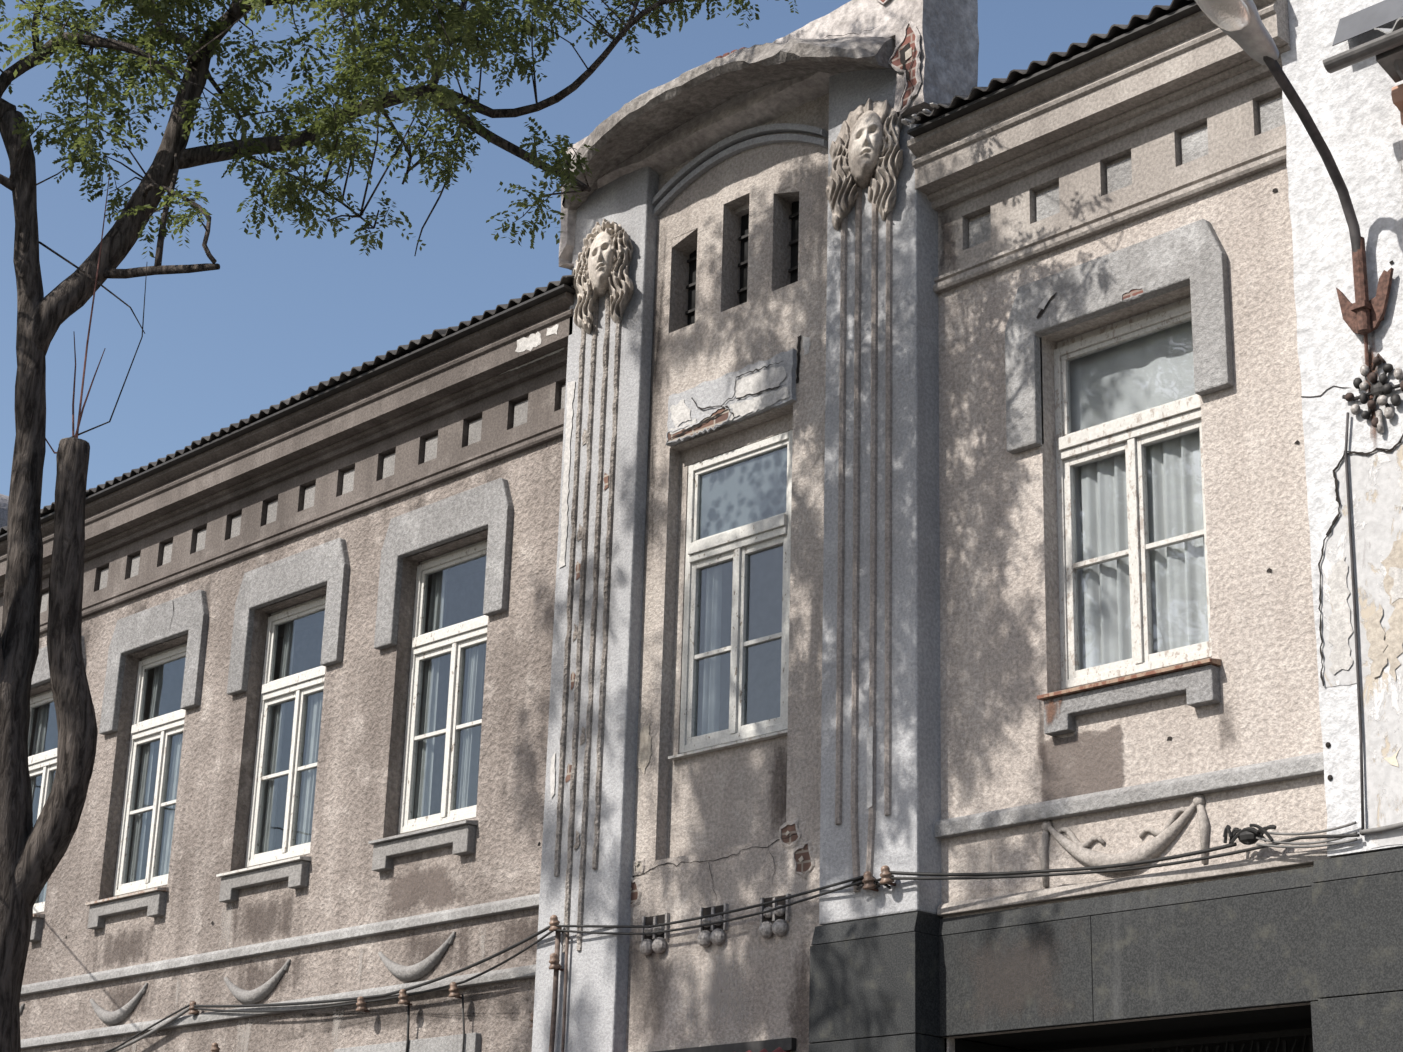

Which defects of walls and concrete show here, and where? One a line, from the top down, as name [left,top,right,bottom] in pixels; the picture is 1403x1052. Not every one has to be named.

spalling [889,20,922,114]
peeling [666,335,811,445]
crack [1301,386,1351,397]
peeling [1318,434,1403,848]
crack [633,833,797,900]
spalling [778,819,815,879]